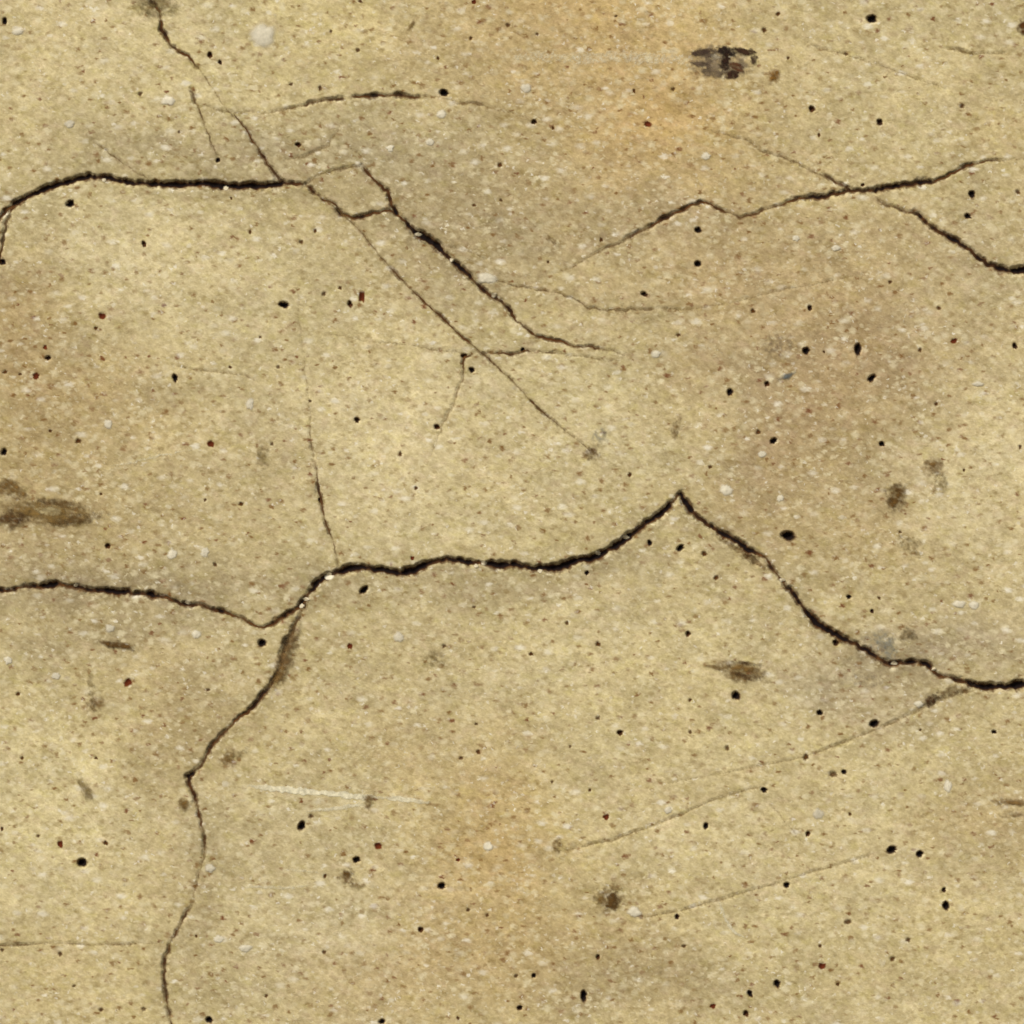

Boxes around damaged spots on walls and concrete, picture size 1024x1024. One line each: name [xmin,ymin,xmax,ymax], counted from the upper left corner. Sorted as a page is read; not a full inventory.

crack [149,0,211,142]
crack [286,92,420,109]
crack [0,116,636,425]
crack [598,152,1024,274]
crack [0,432,1024,862]
crack [162,886,196,1024]